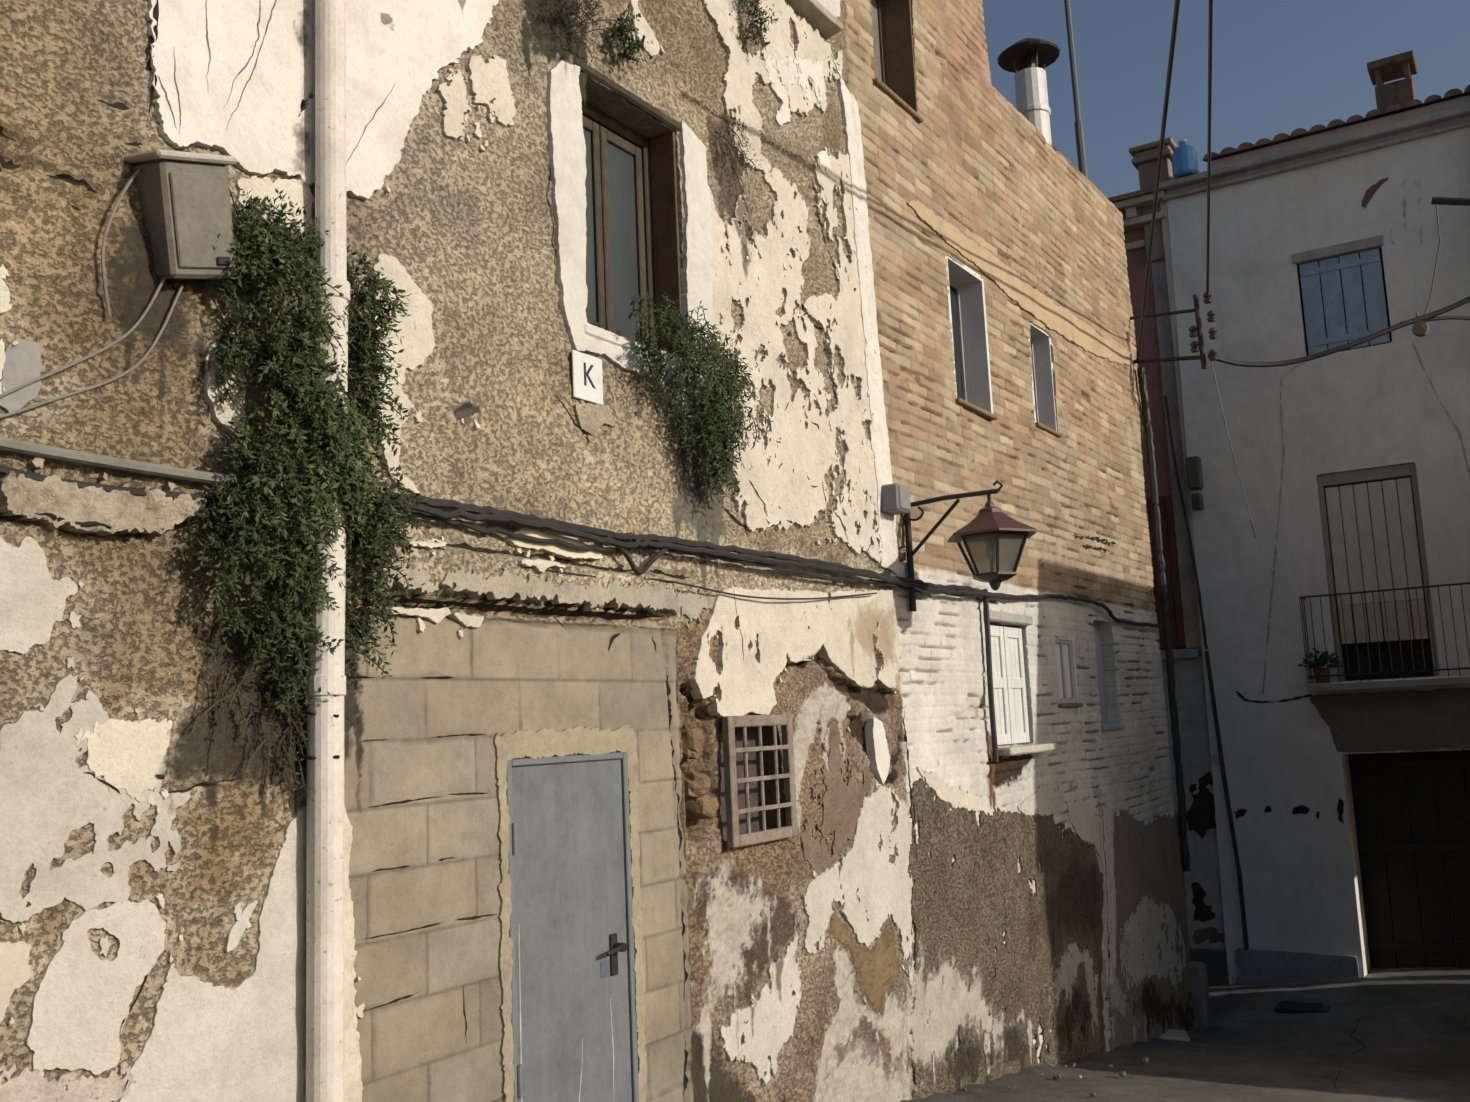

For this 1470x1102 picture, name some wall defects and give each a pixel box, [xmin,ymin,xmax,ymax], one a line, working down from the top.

crack [0,126,101,210]
crack [69,0,276,146]
flaking render [146,0,315,245]
flaking render [346,0,516,200]
flaking render [629,0,665,56]
flaking render [905,200,1132,366]
flaking render [0,536,84,654]
flaking render [680,0,915,1083]
flaking render [0,656,307,1102]
leakage [165,618,306,811]
flaking render [916,754,1033,816]
flaking render [1017,784,1215,992]